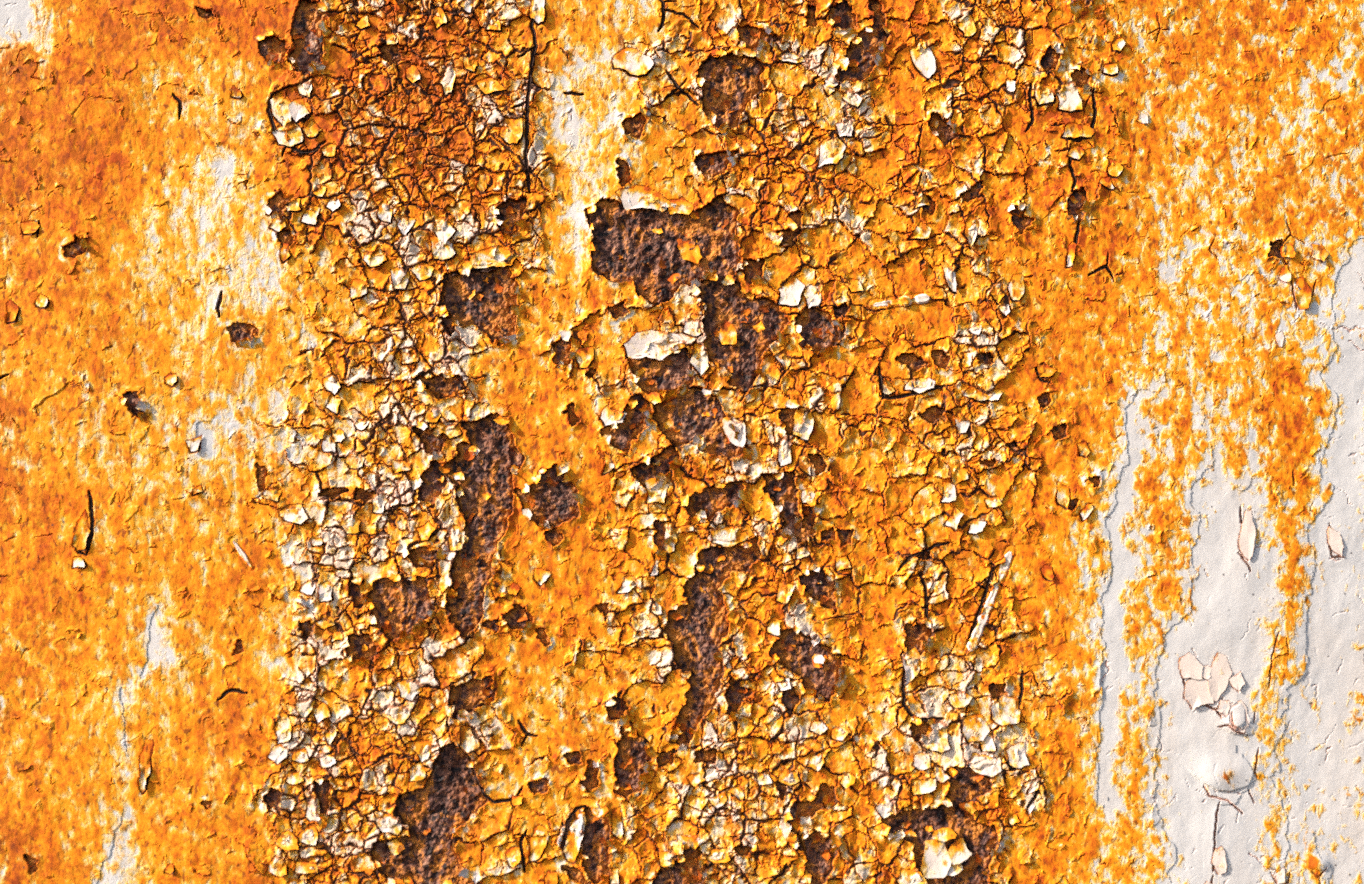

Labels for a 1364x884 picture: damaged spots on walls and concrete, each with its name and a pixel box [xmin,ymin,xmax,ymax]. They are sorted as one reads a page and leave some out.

rust [0,0,345,884]
crack [249,0,584,884]
peeling [372,743,487,884]
peeling [340,414,580,666]
rust [454,0,690,884]
peeling [506,536,760,884]
peeling [585,26,846,488]
crack [562,0,1096,884]
rust [884,0,931,106]
peeling [874,766,997,884]
crack [1073,223,1113,278]
rust [992,0,1364,884]